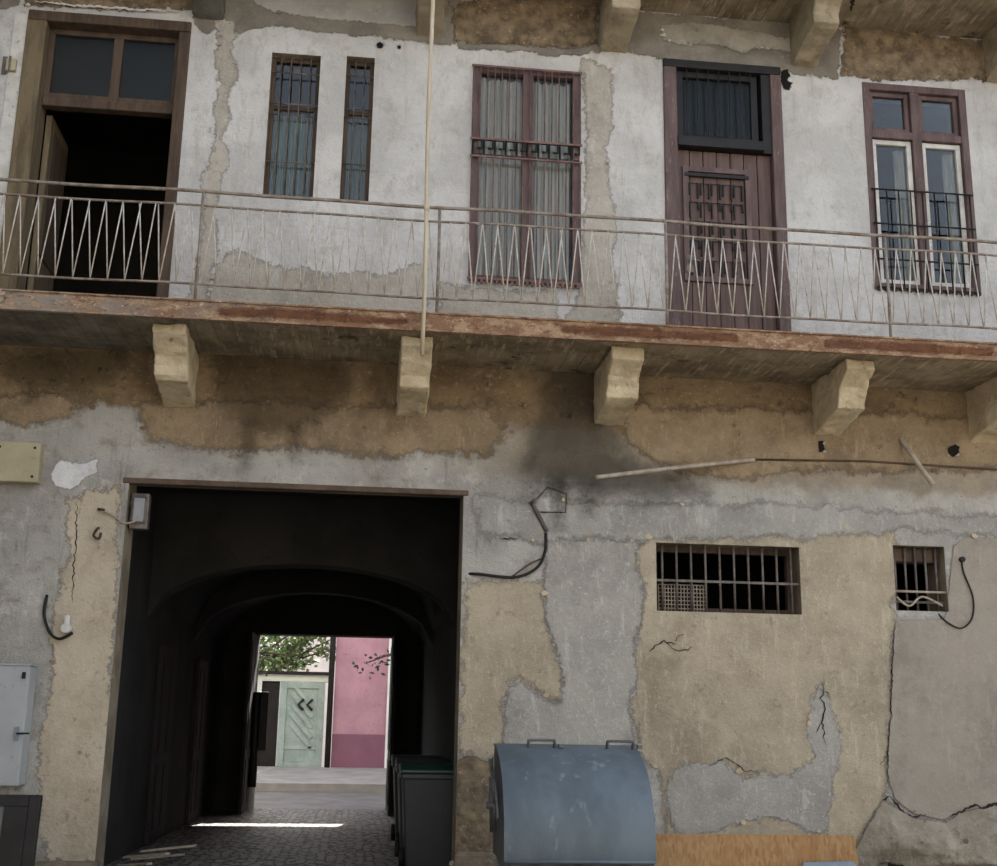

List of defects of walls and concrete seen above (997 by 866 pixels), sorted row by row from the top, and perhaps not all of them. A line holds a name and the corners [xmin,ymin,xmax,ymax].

flaking render [451,0,600,55]
corrosion [561,325,738,342]
corrosion [825,340,993,356]
flaking render [0,391,96,429]
crack [649,634,690,652]
flaking render [472,491,997,847]
flaking render [449,578,563,866]
crack [816,685,829,744]
crack [881,627,926,818]
crack [952,802,997,816]